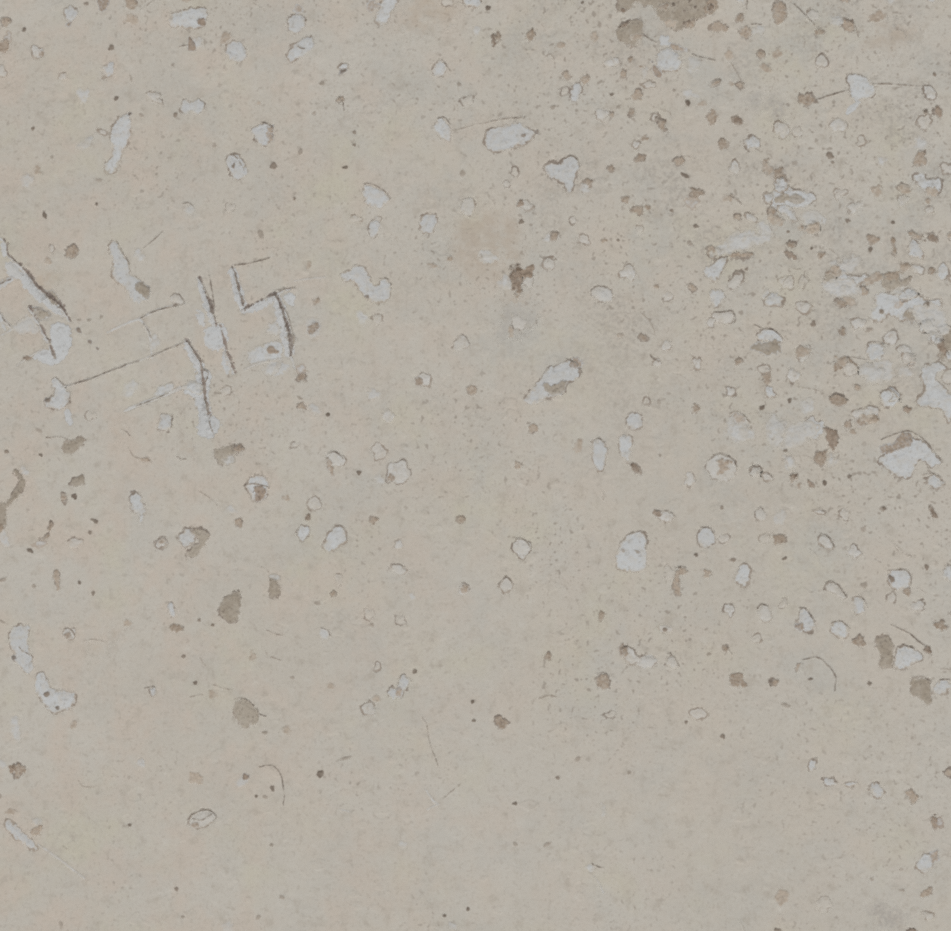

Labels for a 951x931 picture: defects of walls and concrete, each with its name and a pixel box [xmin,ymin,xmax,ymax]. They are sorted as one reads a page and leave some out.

spalling [615,0,752,79]
peeling [542,155,594,193]
peeling [895,149,944,205]
peeling [684,134,823,308]
peeling [734,324,783,366]
peeling [813,229,951,467]
peeling [523,357,584,405]
peeling [877,430,945,491]
spalling [0,468,26,532]
spalling [217,589,242,624]
peeling [8,623,78,730]
spalling [232,697,267,729]